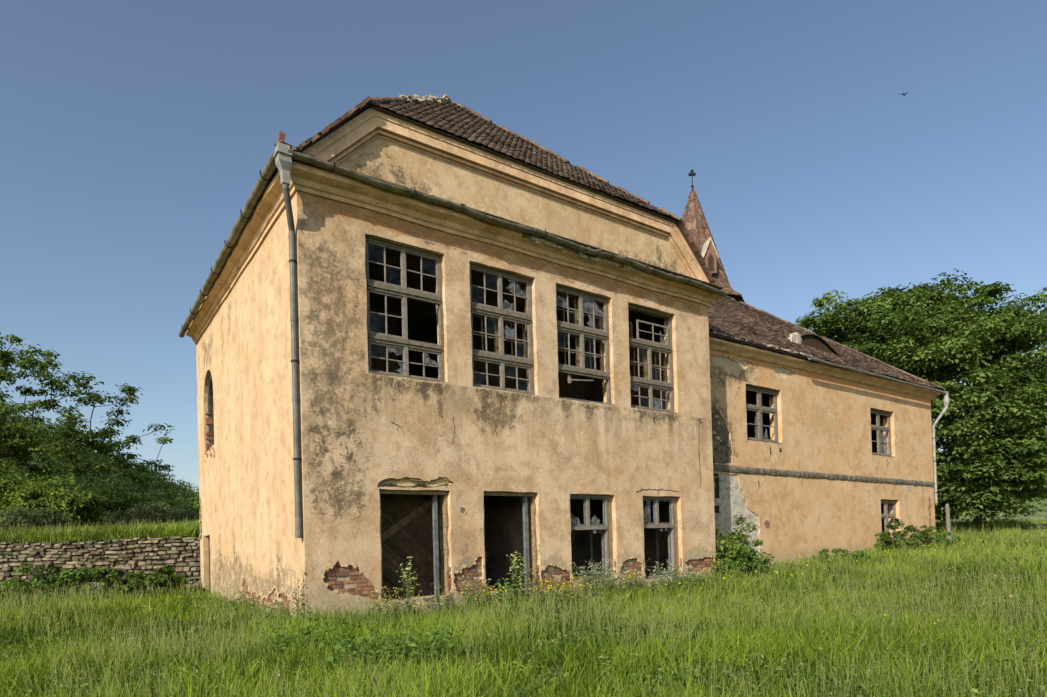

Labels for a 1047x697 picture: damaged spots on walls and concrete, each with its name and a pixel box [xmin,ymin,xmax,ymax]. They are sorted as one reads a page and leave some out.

flaking render [205,413,215,462]
water stain [316,472,364,520]
flaking render [680,406,771,584]
flaking render [319,561,386,620]
flaking render [446,550,492,608]
flaking render [535,557,577,595]